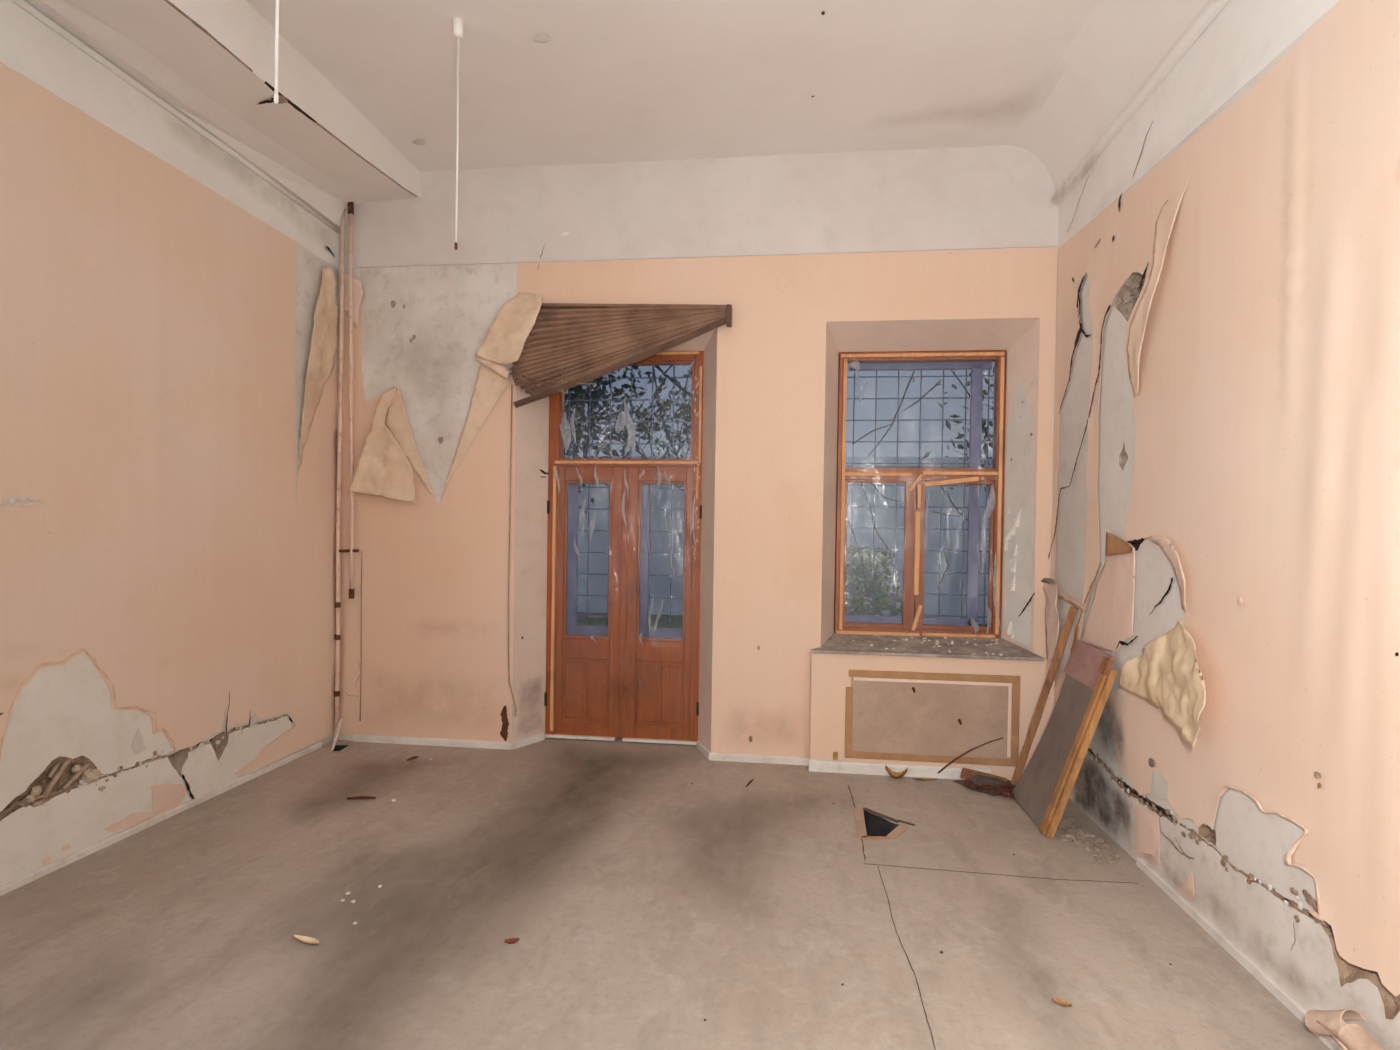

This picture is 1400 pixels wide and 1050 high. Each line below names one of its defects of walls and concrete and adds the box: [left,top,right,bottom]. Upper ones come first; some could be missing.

peeling [295,241,339,490]
peeling [360,264,518,505]
peeling [1056,260,1184,692]
crack [0,692,290,818]
peeling [0,648,293,886]
spalling [854,807,908,839]
crack [1087,748,1332,928]
peeling [1075,753,1400,1050]